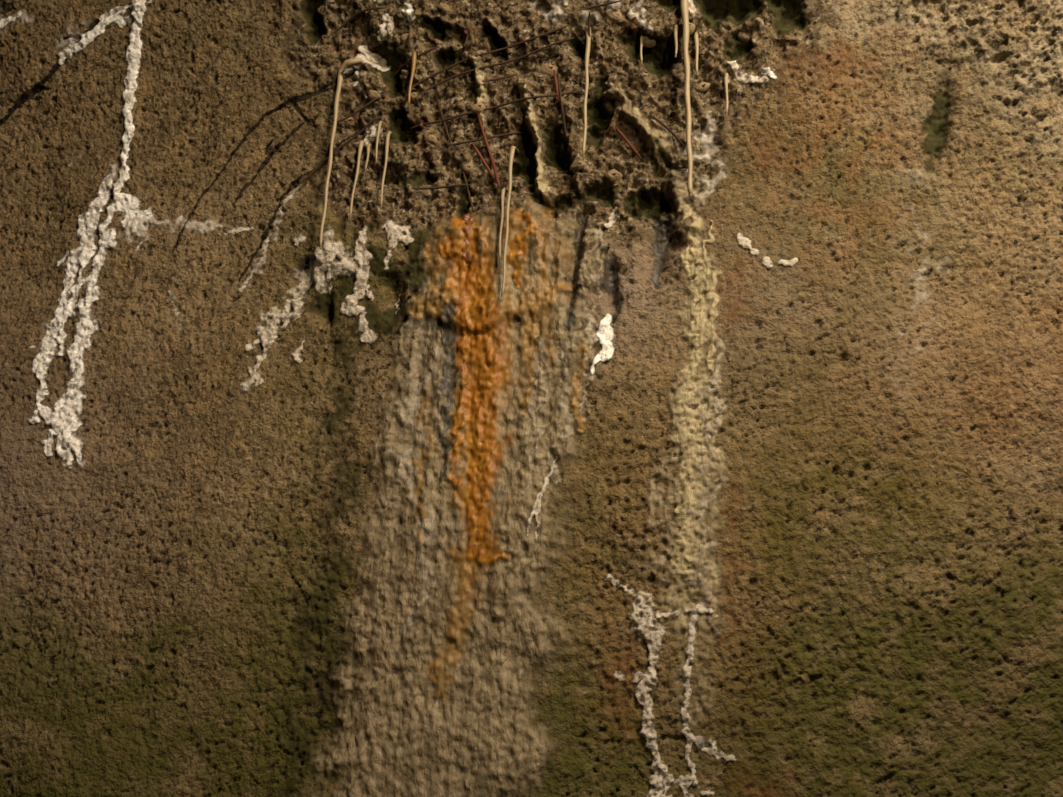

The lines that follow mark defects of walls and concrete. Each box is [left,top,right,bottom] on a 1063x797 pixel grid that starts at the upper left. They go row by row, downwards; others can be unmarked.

water stain [0,11,34,29]
crack [0,5,130,126]
water stain [29,0,254,468]
crack [172,71,355,253]
water stain [239,186,299,292]
crack [239,127,363,281]
spalling [284,0,834,246]
water stain [737,233,798,268]
water stain [240,220,456,797]
rust [413,203,568,699]
water stain [458,207,625,797]
water stain [605,220,737,797]